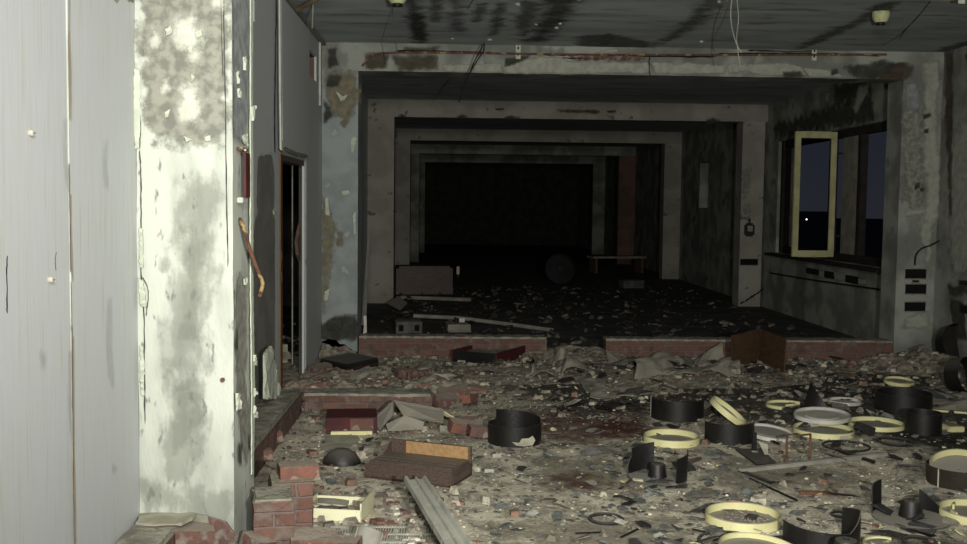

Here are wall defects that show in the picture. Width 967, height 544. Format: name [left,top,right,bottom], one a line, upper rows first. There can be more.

damp [366,0,505,71]
damp [516,0,575,42]
damp [578,0,713,48]
flaking render [310,53,361,127]
peeling [114,0,275,475]